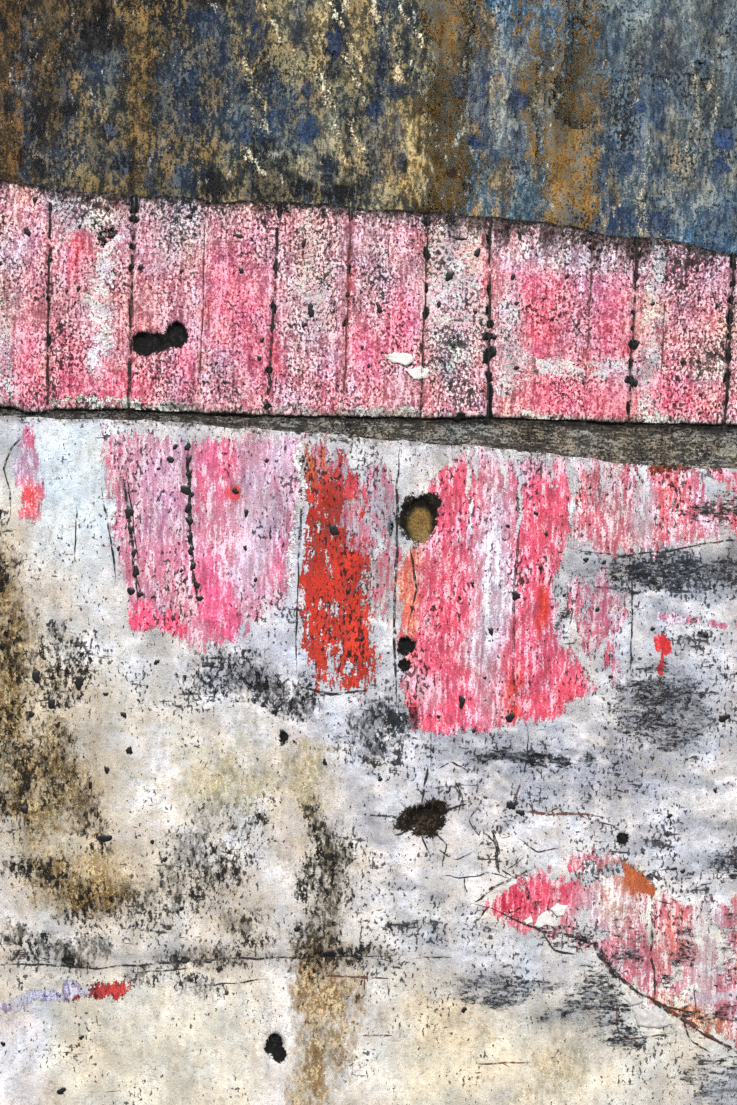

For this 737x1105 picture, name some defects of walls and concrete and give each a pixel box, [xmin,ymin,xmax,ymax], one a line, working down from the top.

damp [0,0,737,276]
damp [0,604,114,856]
damp [0,753,280,1000]
corrosion [285,924,367,1105]
damp [286,699,420,984]
peeling [98,422,737,738]
crack [475,1060,529,1068]
damp [506,801,525,816]
crack [512,476,605,820]
crack [430,736,737,1054]
peeling [481,846,737,1048]
crack [571,539,735,677]